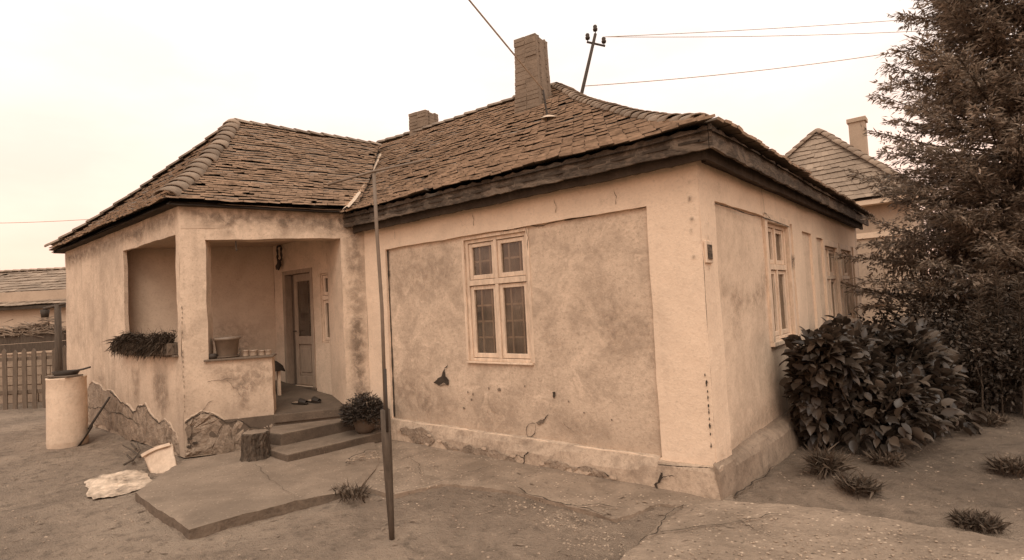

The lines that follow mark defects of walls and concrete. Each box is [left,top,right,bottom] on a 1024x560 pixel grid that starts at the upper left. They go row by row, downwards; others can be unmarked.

spalling [434,365,449,386]
spalling [87,381,273,457]
spalling [396,427,516,462]
crack [654,464,710,489]